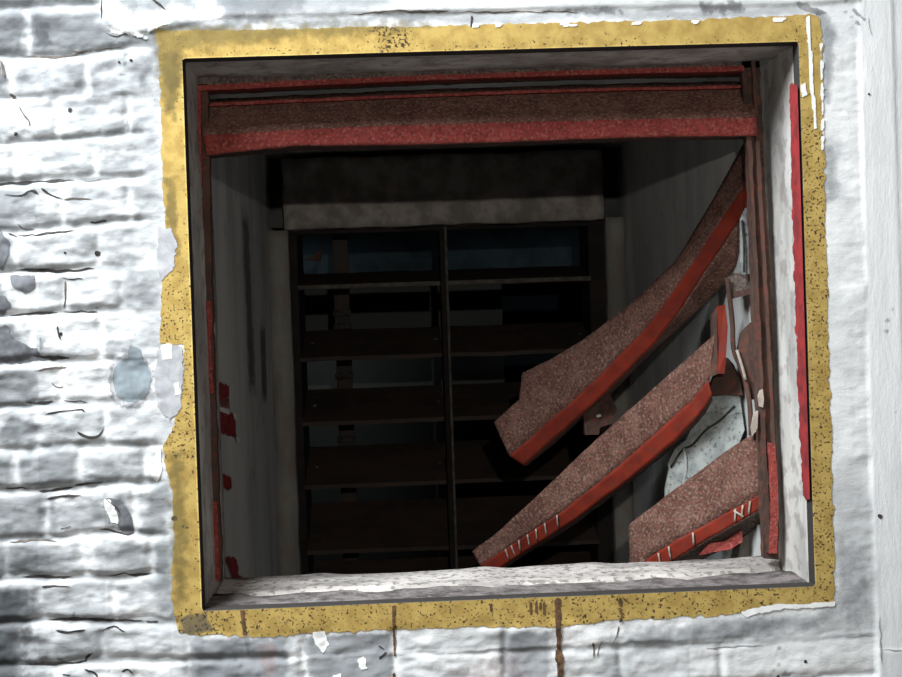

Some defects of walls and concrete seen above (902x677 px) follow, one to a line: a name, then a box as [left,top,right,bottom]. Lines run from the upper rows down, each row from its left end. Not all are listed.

peeling [153,343,184,420]
peeling [151,447,162,481]
rust [529,598,564,677]